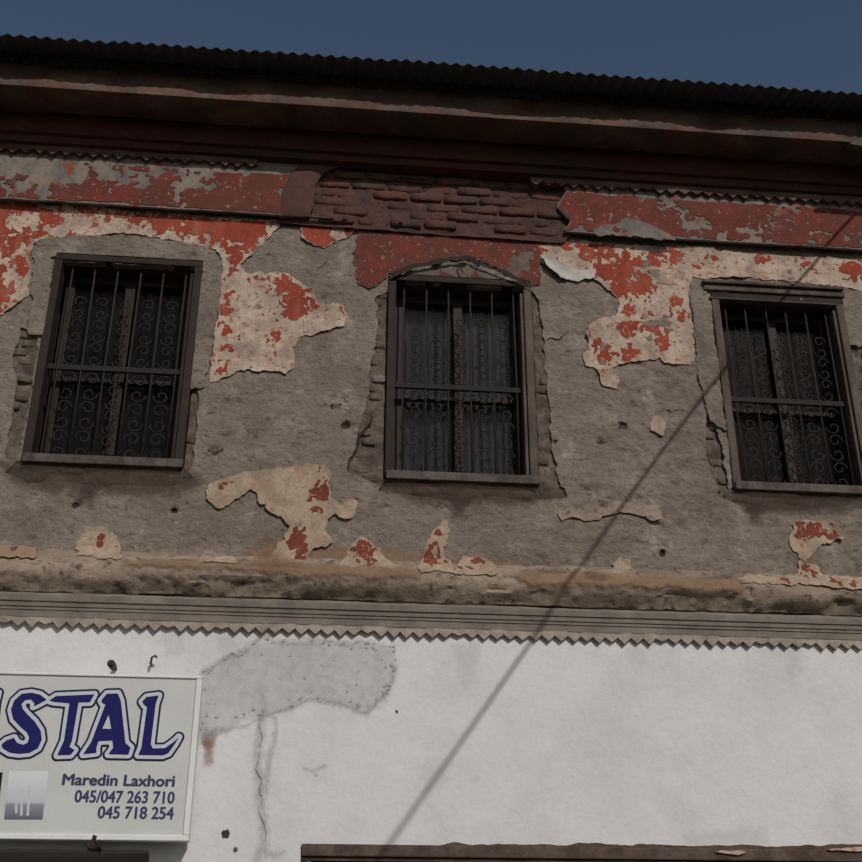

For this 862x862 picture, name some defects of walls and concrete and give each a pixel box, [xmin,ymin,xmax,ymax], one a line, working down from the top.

flaking render [0,162,862,522]
flaking render [206,464,358,560]
flaking render [338,519,498,576]
spalling [705,417,862,590]
crack [256,719,267,840]